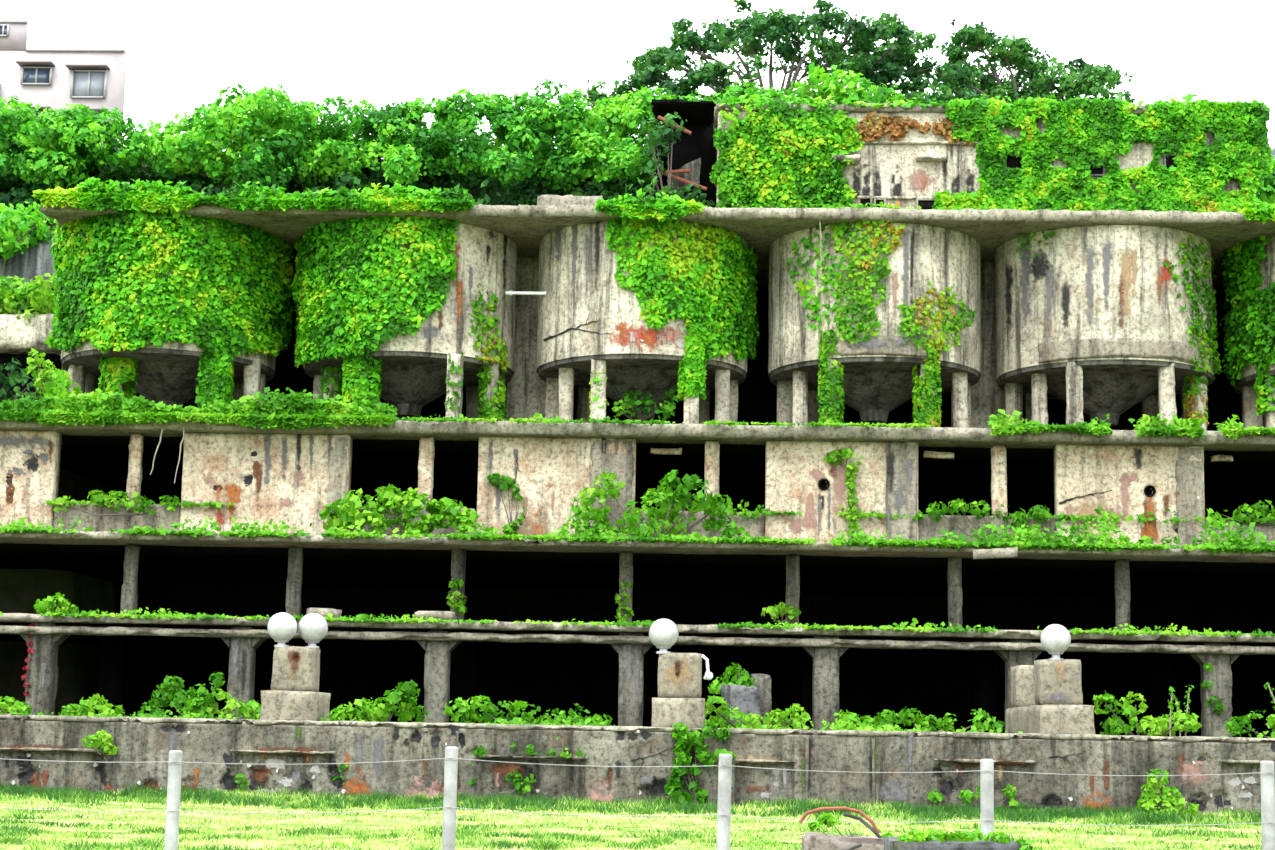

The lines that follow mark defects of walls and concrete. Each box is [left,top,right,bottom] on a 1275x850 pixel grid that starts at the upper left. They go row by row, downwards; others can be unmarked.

damp [1004,244,1070,337]
damp [1085,242,1111,323]
corrosion [1119,250,1138,327]
corrosion [1158,258,1172,295]
corrosion [611,323,681,351]
corrosion [204,475,241,526]
corrosion [1066,472,1138,534]
corrosion [1140,495,1169,539]
corrosion [1178,755,1207,783]